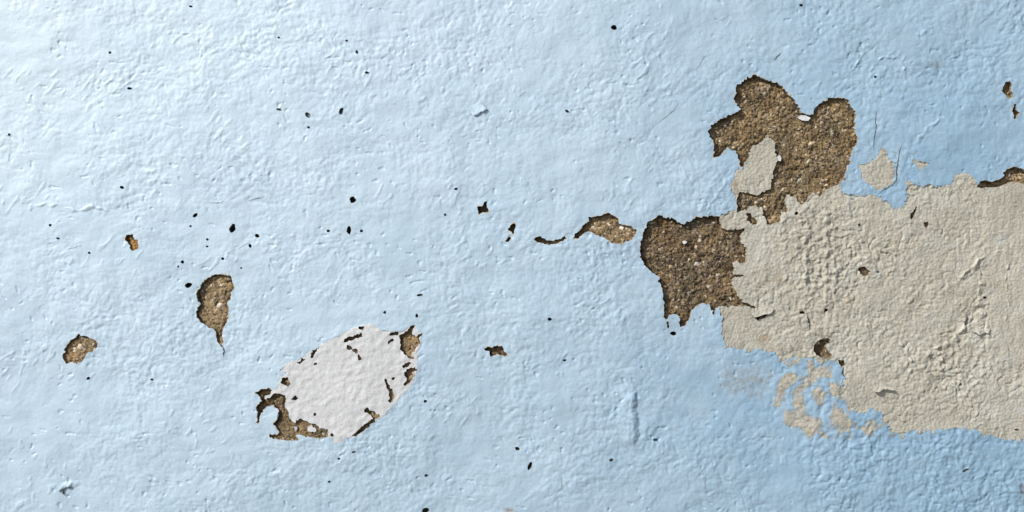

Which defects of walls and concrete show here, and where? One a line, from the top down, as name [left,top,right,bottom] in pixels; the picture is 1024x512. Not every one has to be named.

peeling [127,235,138,250]
peeling [573,76,1024,442]
spalling [63,335,98,363]
spalling [187,274,235,357]
peeling [255,314,422,444]
peeling [484,346,507,356]